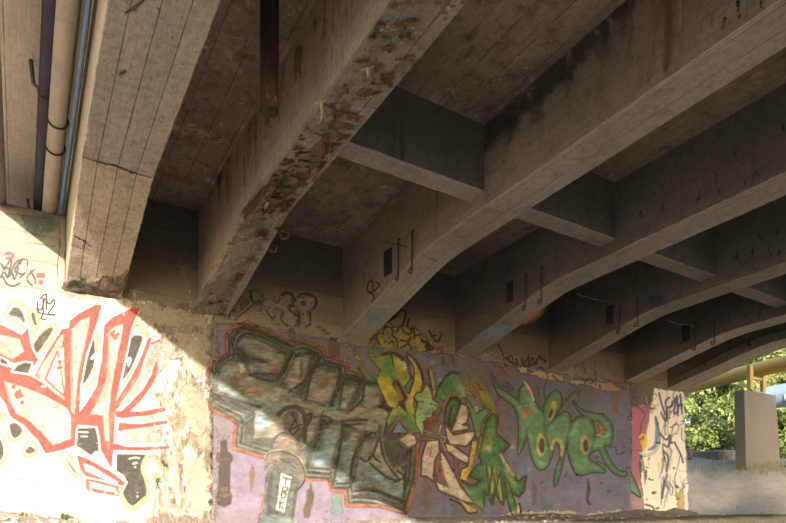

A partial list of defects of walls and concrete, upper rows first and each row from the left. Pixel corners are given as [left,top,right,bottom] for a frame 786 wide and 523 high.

crack [83,157,154,179]
spalling [227,52,393,255]
spalling [61,268,128,297]
flaking render [132,279,227,439]
flaking render [171,454,213,523]